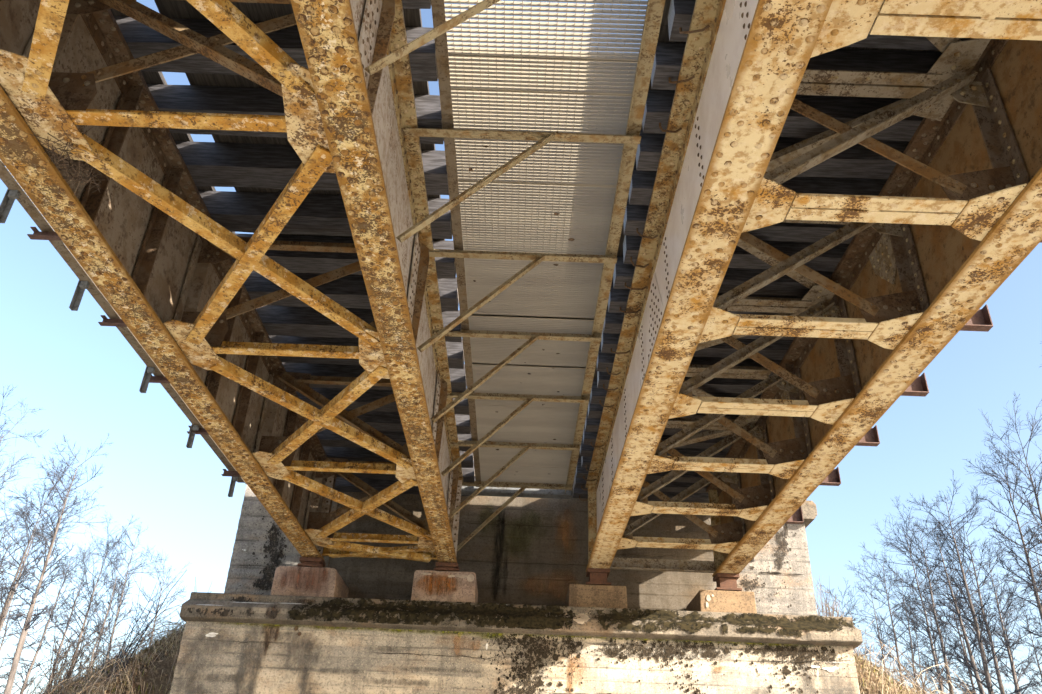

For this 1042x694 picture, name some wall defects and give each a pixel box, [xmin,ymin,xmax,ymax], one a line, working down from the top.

water stain [178,509,358,694]
corrosion [417,575,456,594]
water stain [492,514,507,605]
water stain [373,667,468,685]
water stain [472,634,860,694]